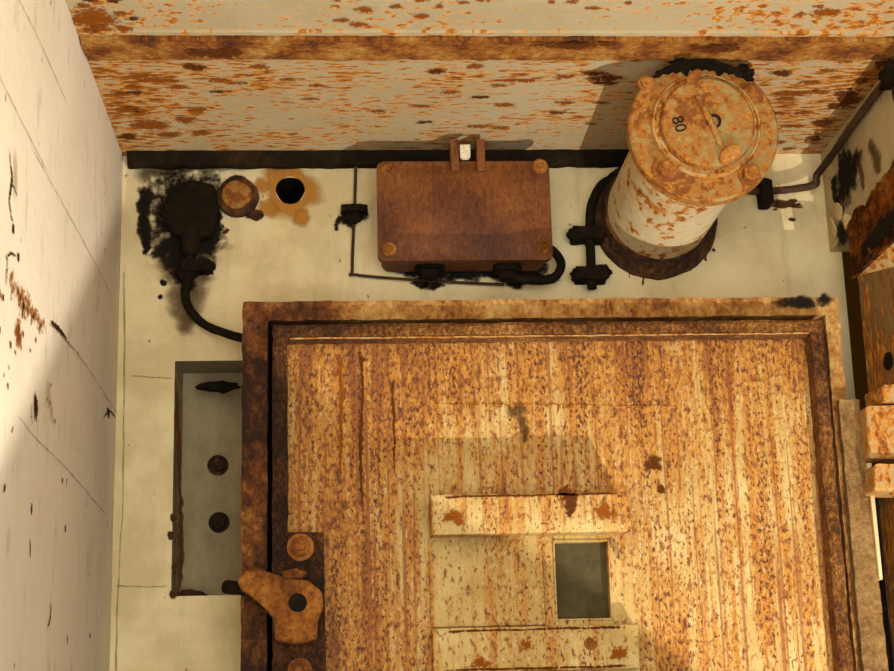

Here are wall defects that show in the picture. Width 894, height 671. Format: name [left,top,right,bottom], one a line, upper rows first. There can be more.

corrosion [71,0,140,31]
corrosion [332,0,374,28]
corrosion [795,5,841,17]
corrosion [110,74,213,140]
corrosion [182,48,270,93]
corrosion [440,91,515,107]
corrosion [491,79,539,87]
corrosion [552,71,625,86]
corrosion [771,60,869,151]
corrosion [246,168,318,225]
corrosion [0,271,46,354]
leakage [160,262,209,332]